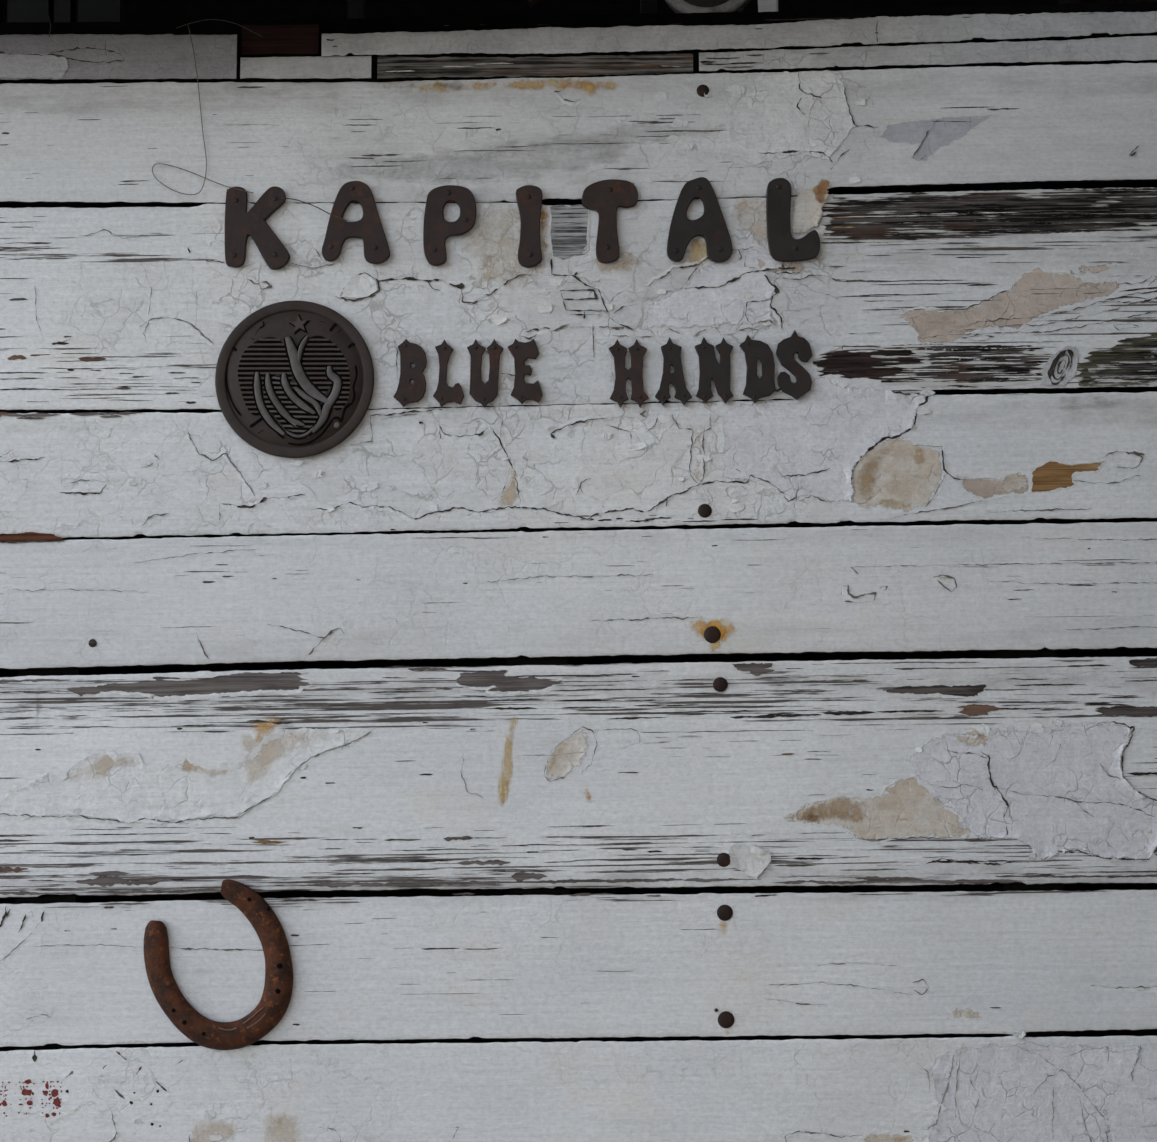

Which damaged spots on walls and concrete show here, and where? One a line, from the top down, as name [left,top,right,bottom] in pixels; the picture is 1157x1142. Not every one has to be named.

peeling [0,53,68,79]
crack [764,72,876,169]
peeling [555,176,1157,523]
crack [0,450,43,462]
crack [186,409,830,525]
crack [60,479,107,495]
crack [488,574,650,583]
crack [591,615,697,623]
corrosion [695,621,733,649]
peeling [0,658,1157,909]
peeling [864,1030,1157,1142]